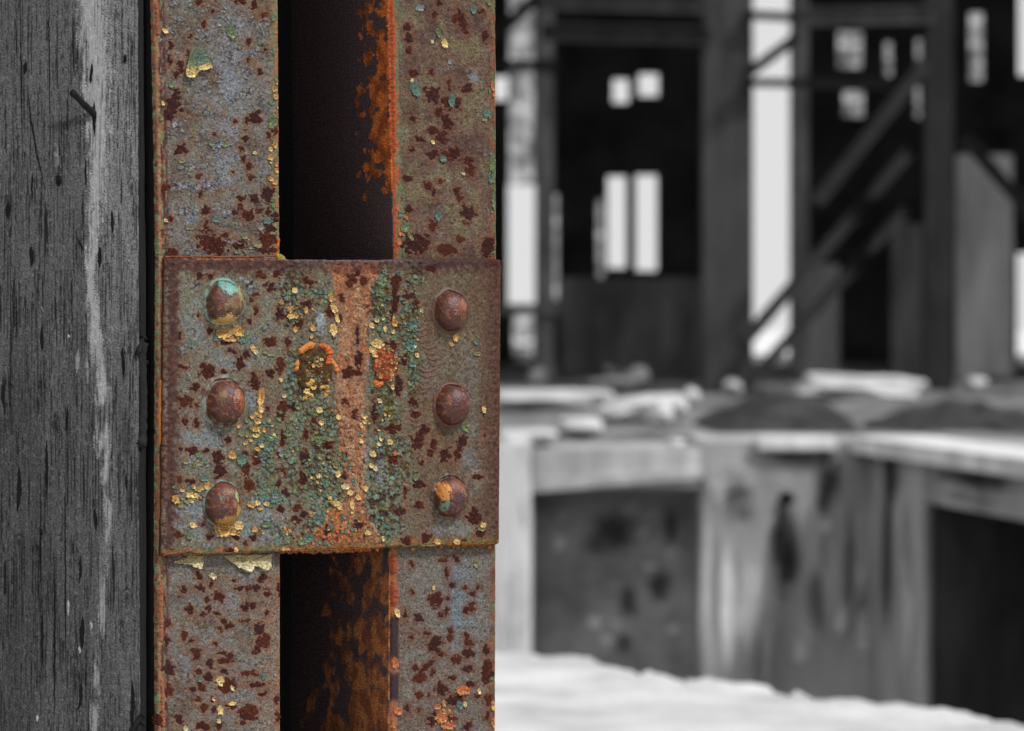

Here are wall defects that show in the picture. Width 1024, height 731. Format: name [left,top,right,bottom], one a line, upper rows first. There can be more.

peeling [168,47,213,92]
rust [386,0,397,154]
rust [423,86,475,177]
rust [165,186,286,260]
rust [400,233,457,257]
rust [177,362,215,409]
rust [342,351,362,378]
peeling [213,281,459,572]
rust [400,506,496,551]
peeling [174,555,217,580]
rust [218,670,265,693]
rust [413,636,495,729]